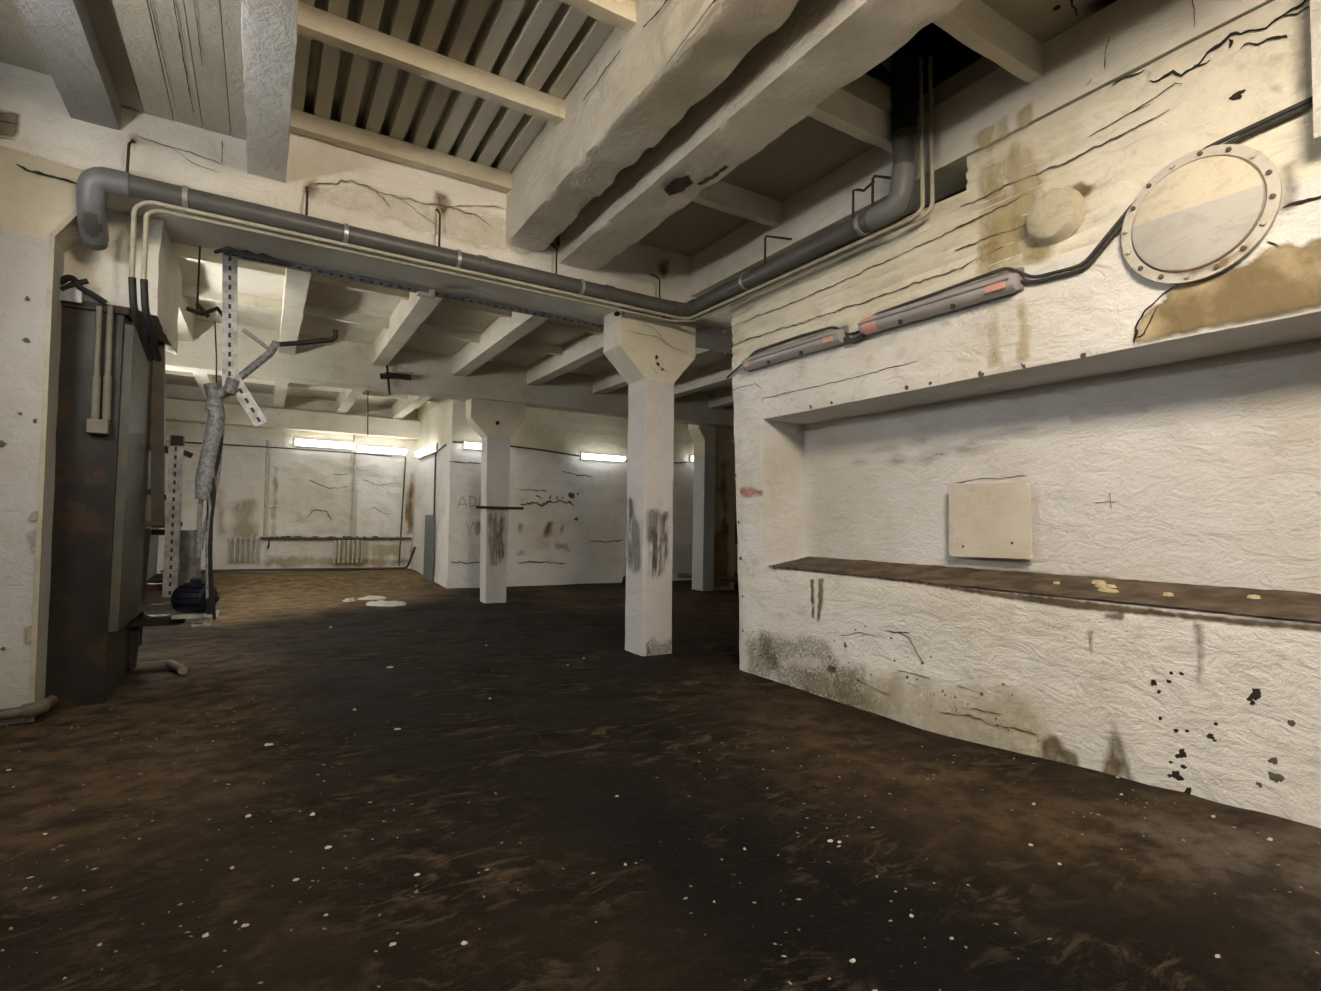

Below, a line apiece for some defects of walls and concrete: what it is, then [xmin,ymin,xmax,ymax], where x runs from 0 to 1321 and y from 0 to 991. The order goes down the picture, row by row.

crack [149,0,203,112]
crack [138,136,223,172]
crack [728,0,1310,347]
crack [309,180,507,226]
damp [981,150,1045,270]
flaking render [1133,238,1321,343]
peeling [1246,688,1262,705]
peeling [1167,754,1191,794]
peeling [1256,757,1285,788]